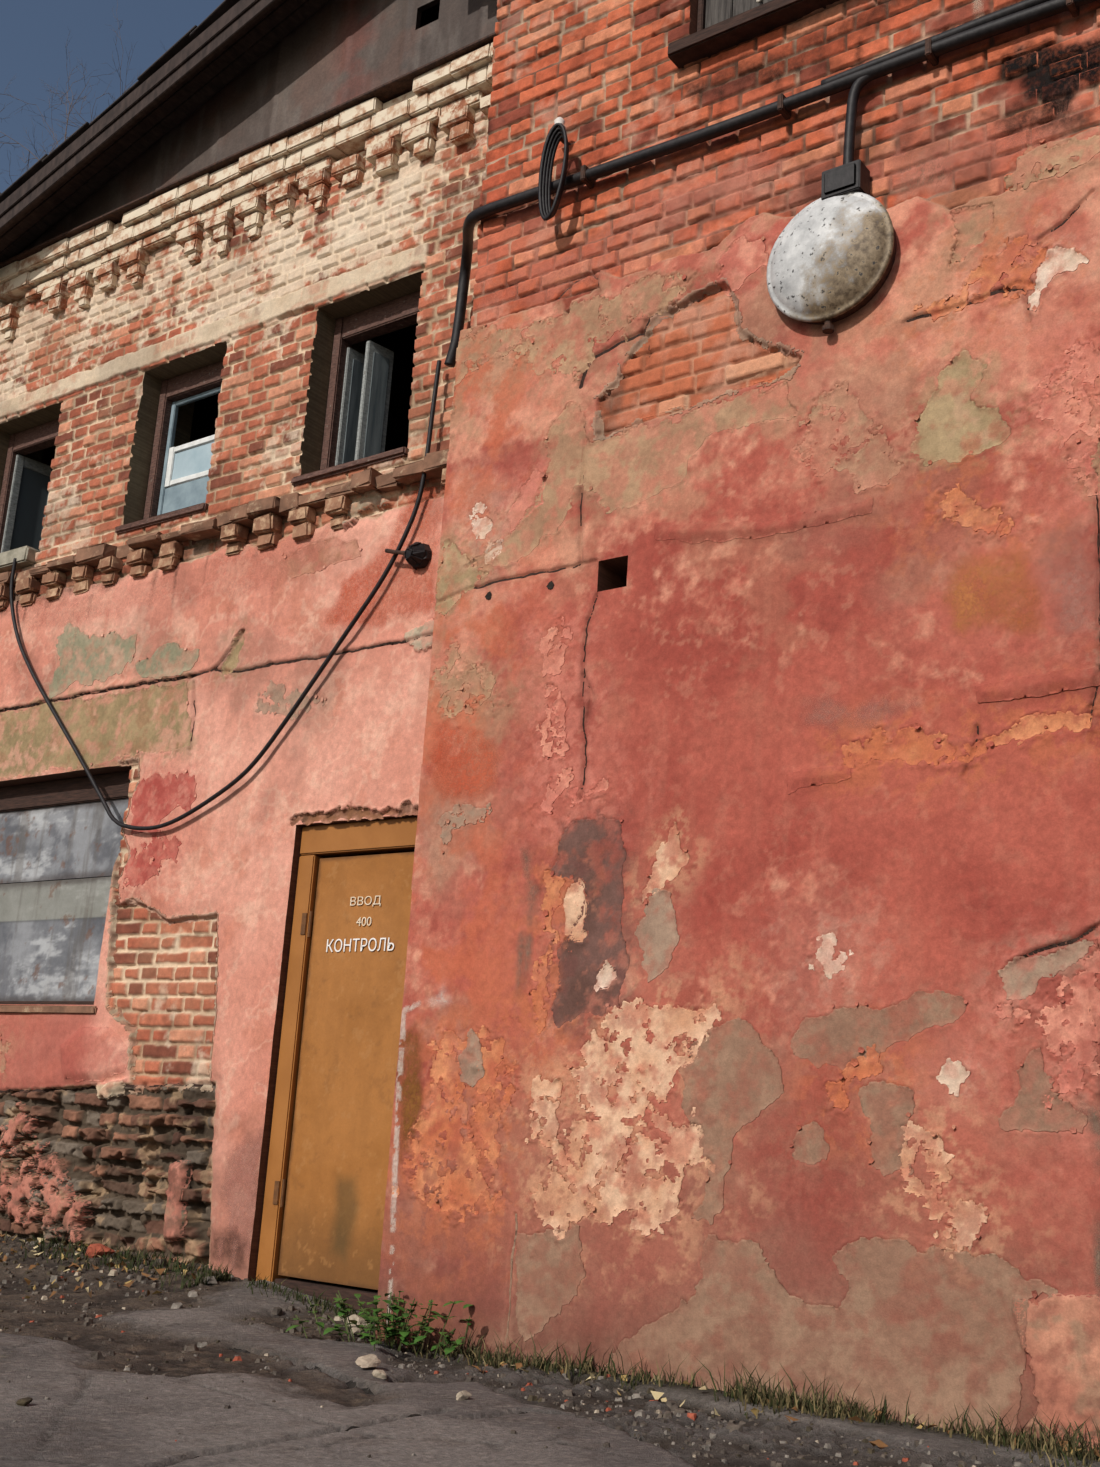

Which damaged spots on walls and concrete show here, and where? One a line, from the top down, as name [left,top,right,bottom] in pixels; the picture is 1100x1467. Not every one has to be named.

crack [444,564,581,601]
peeling [404,236,1015,718]
crack [1092,475,1100,642]
crack [0,635,431,741]
crack [581,596,598,789]
flaking render [0,623,219,1095]
peeling [392,616,1100,1452]
crack [1023,926,1096,957]